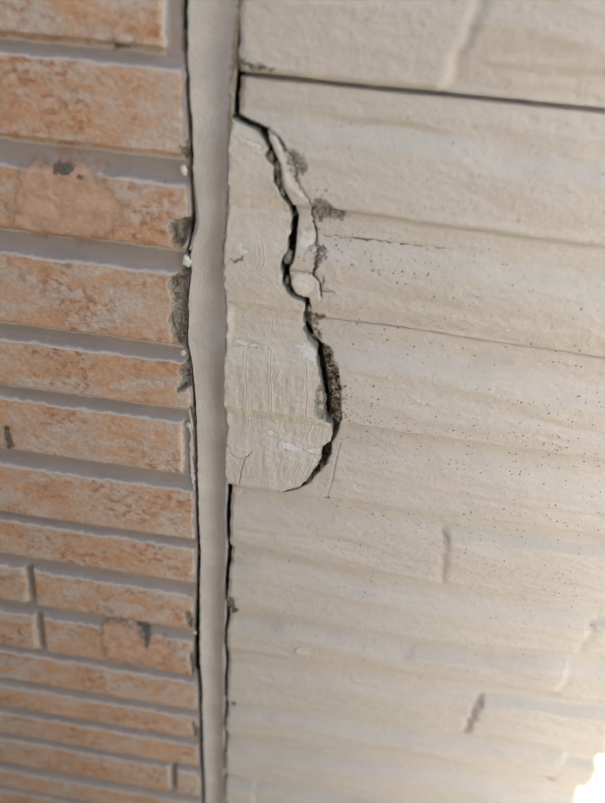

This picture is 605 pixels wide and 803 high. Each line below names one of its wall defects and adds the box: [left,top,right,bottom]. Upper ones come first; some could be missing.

crack [233,62,449,494]